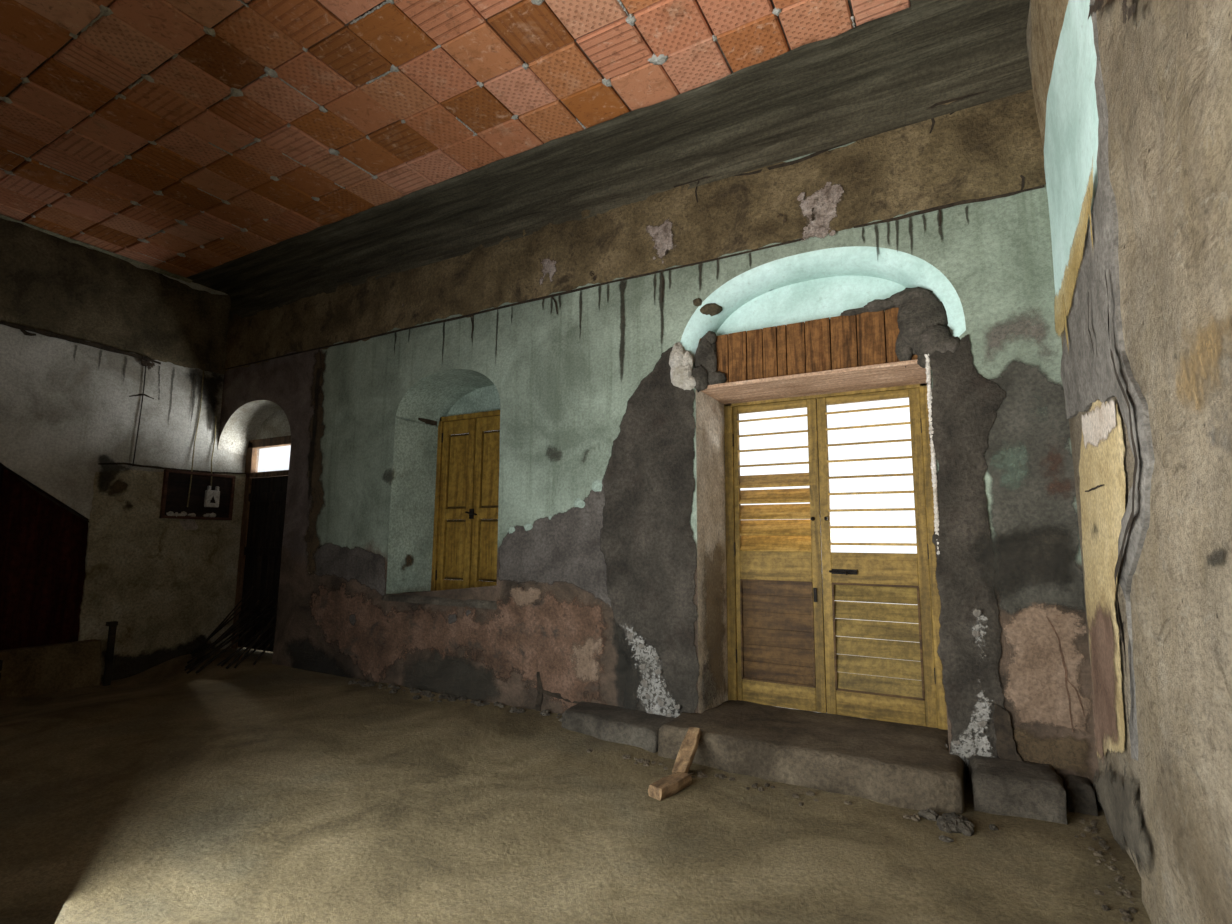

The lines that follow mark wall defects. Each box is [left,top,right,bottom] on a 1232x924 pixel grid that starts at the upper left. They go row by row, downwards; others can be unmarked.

spalling [1088,0,1104,19]
spalling [1122,0,1136,23]
flaking render [0,0,1069,375]
damp [862,211,943,257]
damp [158,366,224,438]
damp [598,280,627,380]
damp [653,270,671,344]
spalling [669,342,696,390]
peeling [306,463,612,713]
damp [612,621,680,718]
peeling [1003,603,1092,735]
damp [946,679,993,766]